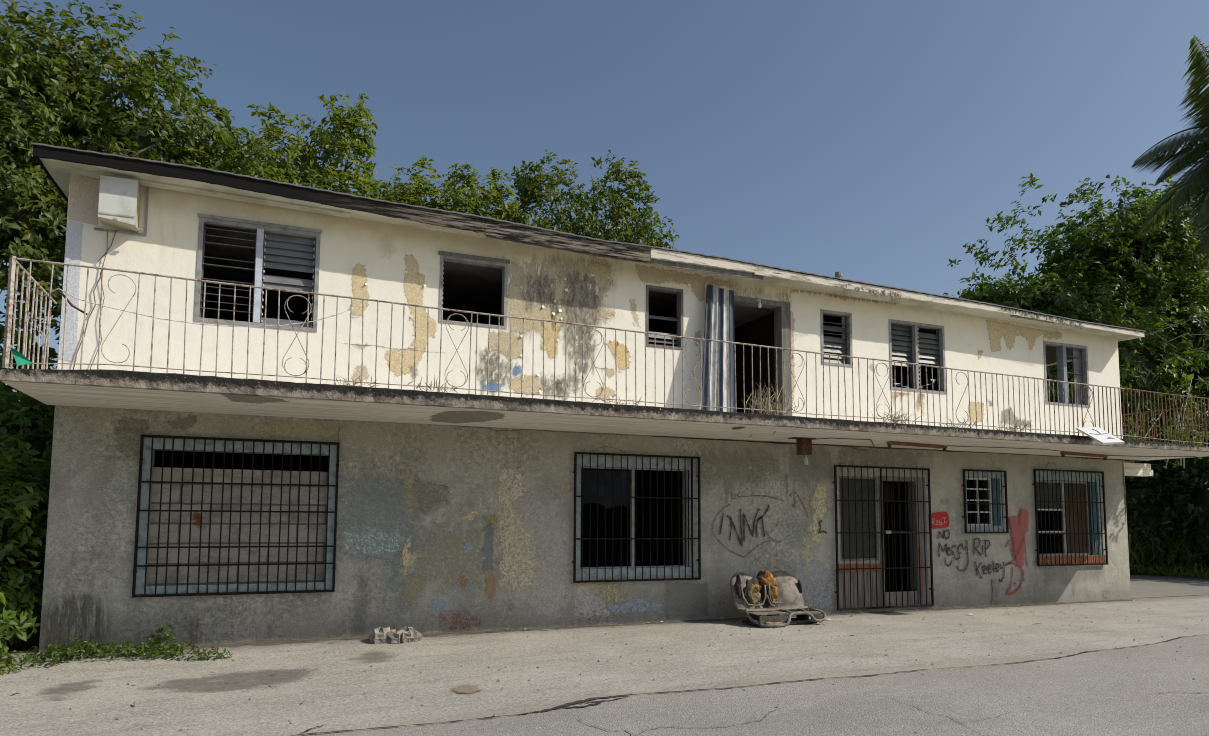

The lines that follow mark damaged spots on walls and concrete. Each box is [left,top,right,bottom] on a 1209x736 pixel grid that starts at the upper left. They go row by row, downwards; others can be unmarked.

peeling [350,264,370,318]
peeling [385,254,437,377]
leakage [507,259,614,396]
peeling [596,339,631,401]
peeling [978,320,1062,359]
peeling [968,402,984,423]
crack [291,634,1207,736]